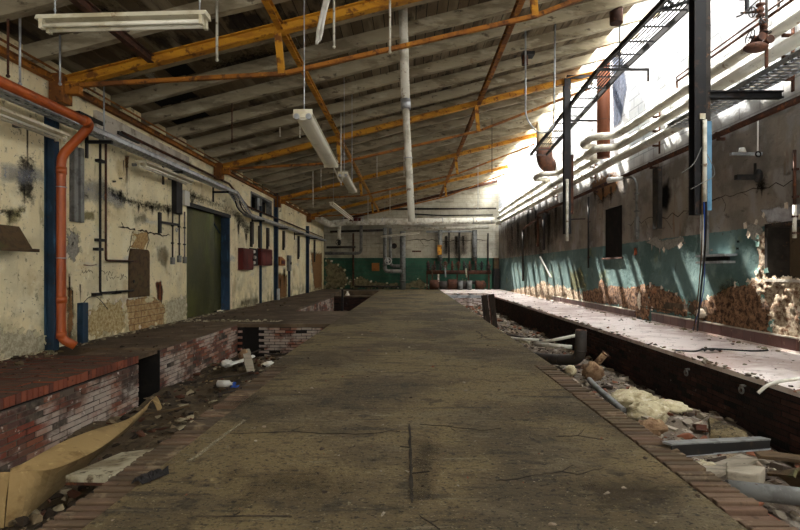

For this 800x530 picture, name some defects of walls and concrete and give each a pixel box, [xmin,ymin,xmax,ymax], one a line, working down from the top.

damp [17,130,36,203]
damp [111,189,172,215]
peeling [88,294,187,339]
flaking render [508,202,800,342]
spalling [495,298,800,455]
crack [230,424,500,530]